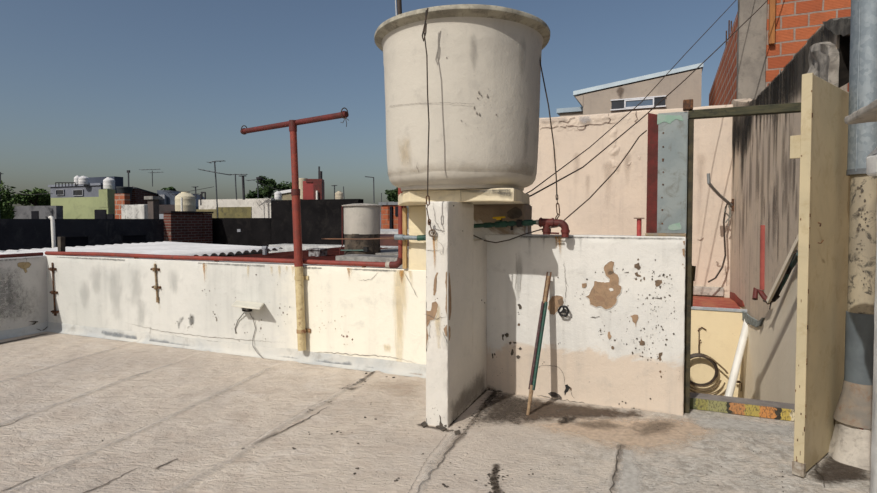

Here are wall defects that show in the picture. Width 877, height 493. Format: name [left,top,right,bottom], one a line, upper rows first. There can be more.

leakage [732,26,833,174]
peeling [426,272,451,351]
peeling [547,294,569,316]
peeling [576,258,675,378]
crack [417,434,462,493]
leakage [490,464,501,493]
crack [609,446,621,493]